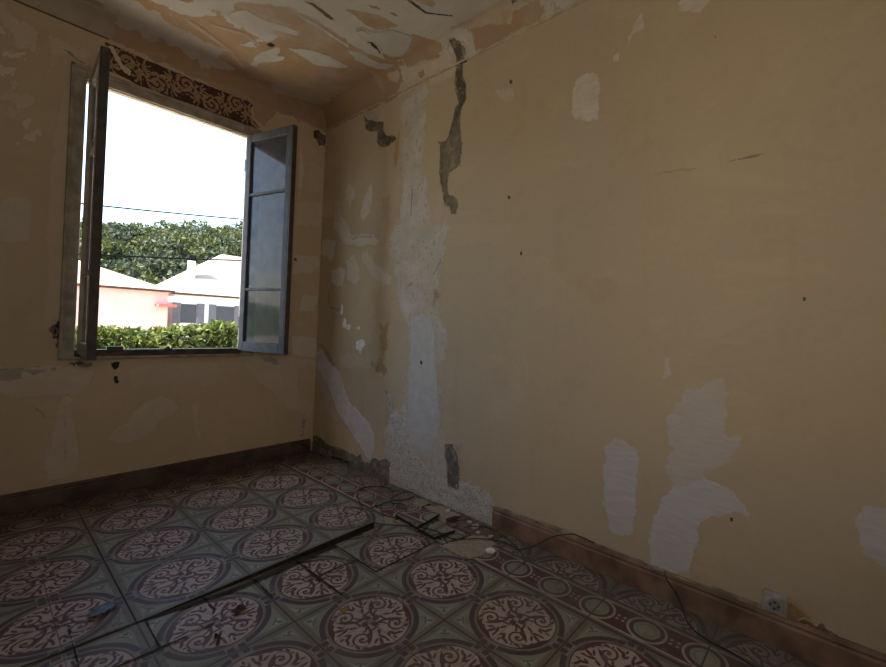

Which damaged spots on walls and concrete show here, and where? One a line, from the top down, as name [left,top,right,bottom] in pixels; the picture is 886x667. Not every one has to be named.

crack [354,27,406,60]
peeling [451,0,546,53]
peeling [101,0,444,147]
crack [363,110,398,148]
crack [405,0,467,216]